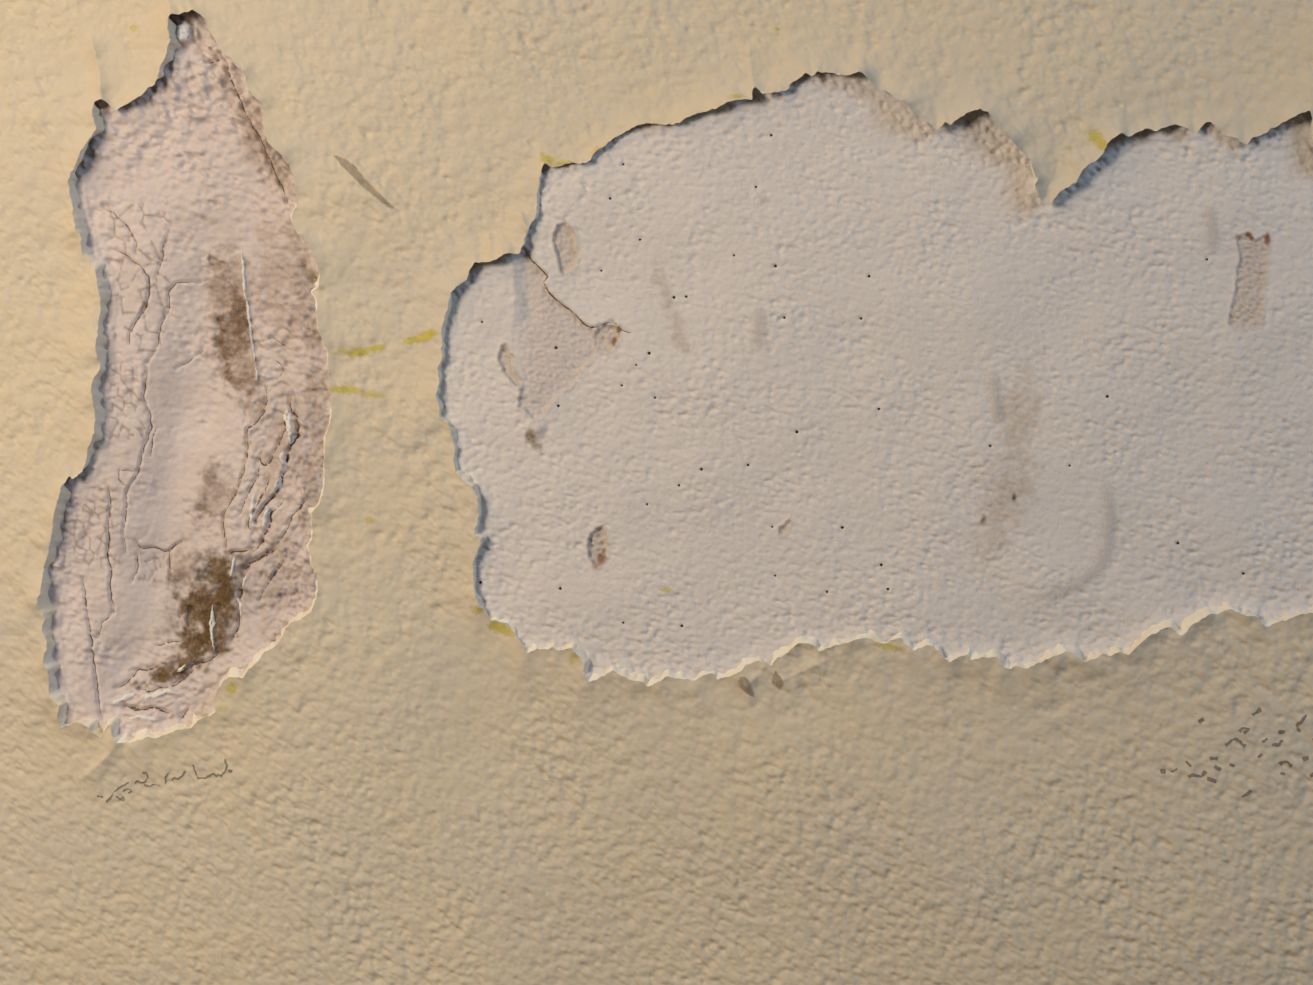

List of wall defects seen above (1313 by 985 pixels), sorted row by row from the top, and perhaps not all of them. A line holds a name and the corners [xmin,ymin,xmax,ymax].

crack [106,209,203,583]
peeling [37,10,332,798]
leakage [152,557,236,681]
crack [120,338,303,718]
leakage [215,298,248,382]
peeling [436,71,1313,703]